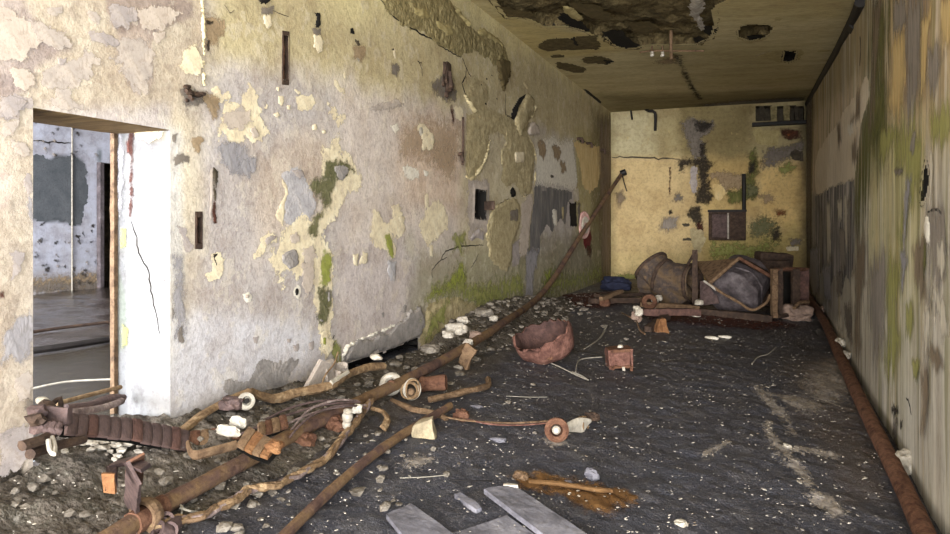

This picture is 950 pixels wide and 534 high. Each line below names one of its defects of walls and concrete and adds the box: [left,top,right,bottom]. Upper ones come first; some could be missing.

spalling [488,0,727,73]
spalling [736,17,804,63]
peeling [0,3,183,226]
rust [126,133,134,216]
peeling [174,136,204,165]
spalling [383,0,581,272]
damp [870,0,950,291]
crack [131,222,160,333]
peeling [209,82,480,395]
crack [432,244,483,278]
damp [674,56,885,518]
damp [891,405,903,449]